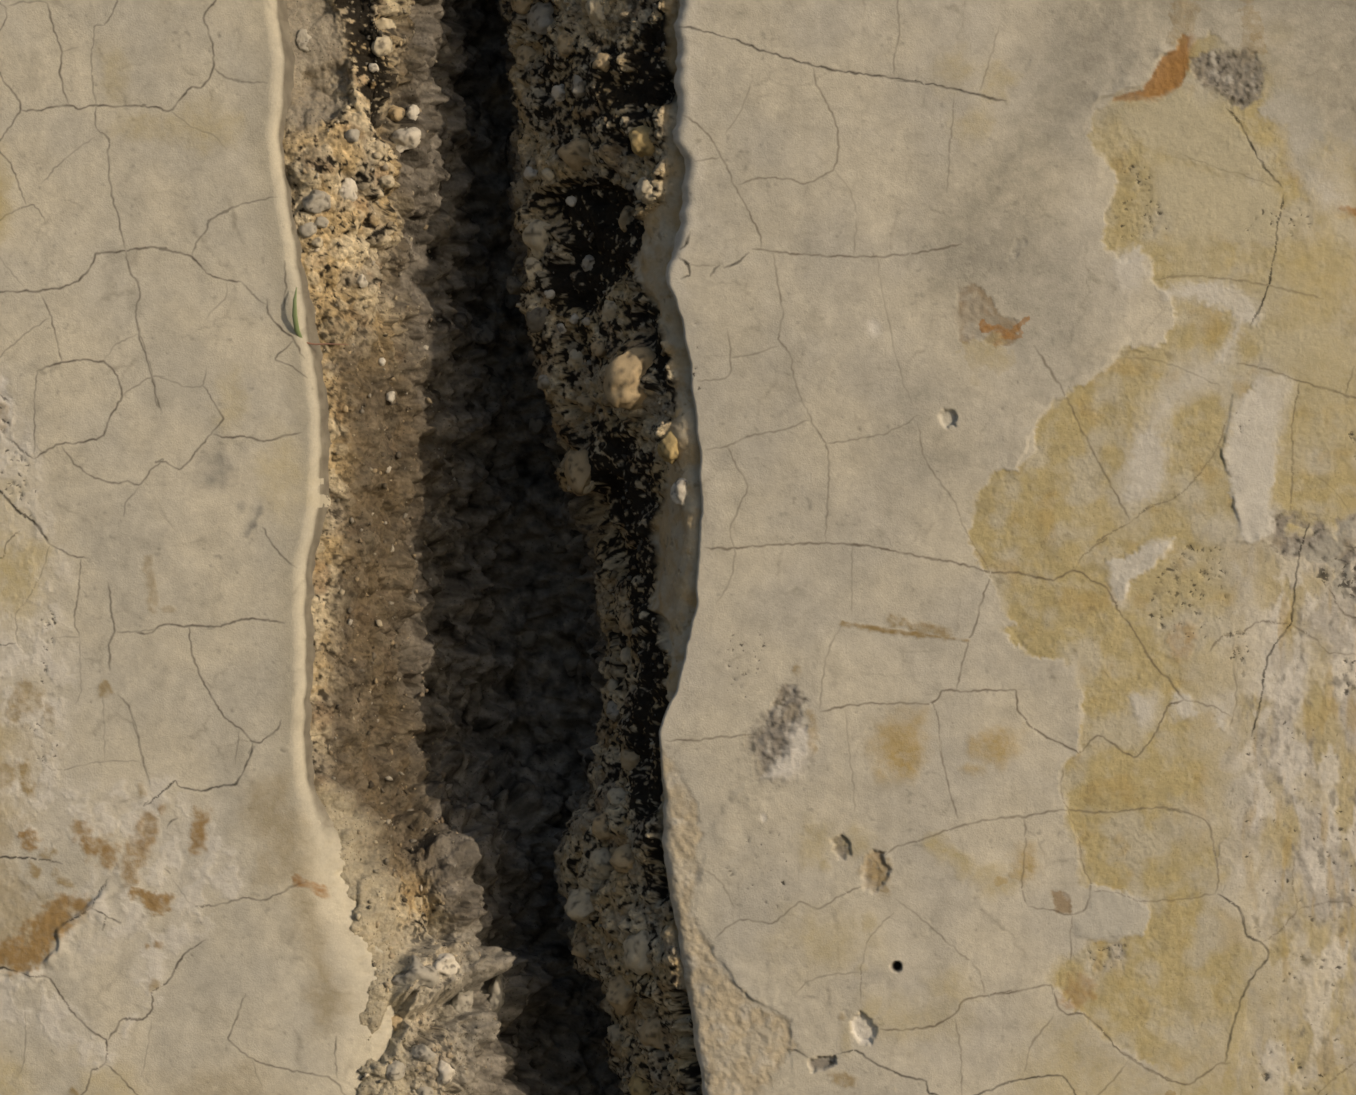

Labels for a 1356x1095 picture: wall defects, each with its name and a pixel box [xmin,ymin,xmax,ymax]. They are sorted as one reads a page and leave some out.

crack [0,0,308,517]
crack [0,490,286,829]
crack [262,526,298,568]
spalling [659,0,838,1095]
crack [282,0,1356,1095]
peeling [956,58,1356,1095]
crack [0,855,63,865]
rust [0,887,98,983]
crack [0,867,307,1095]
crack [227,993,347,1095]